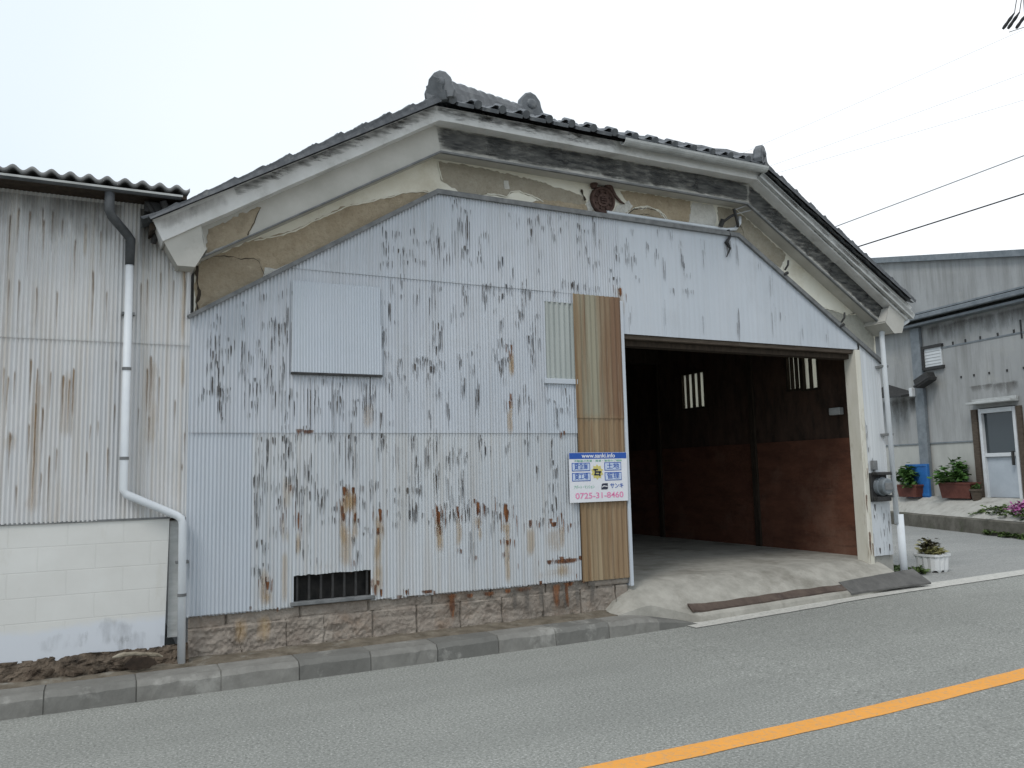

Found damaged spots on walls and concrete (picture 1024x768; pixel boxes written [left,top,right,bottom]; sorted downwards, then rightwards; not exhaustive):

peeling [614,191,691,222]
peeling [194,161,597,364]
peeling [389,289,445,392]
peeling [459,359,480,415]
corrosion [29,361,75,474]
corrosion [340,487,356,526]
corrosion [433,505,463,535]
corrosion [474,499,571,546]
corrosion [450,555,585,617]